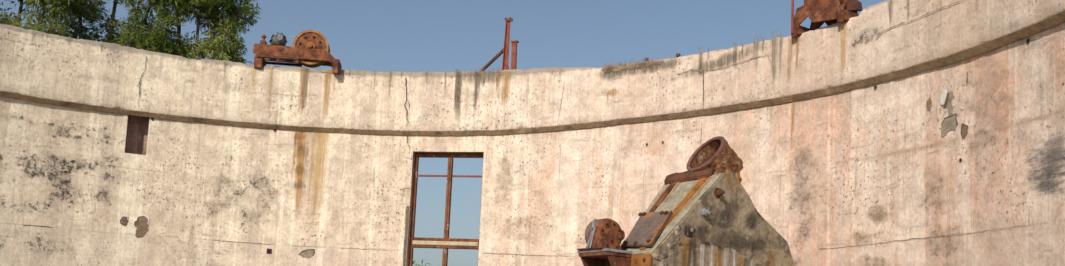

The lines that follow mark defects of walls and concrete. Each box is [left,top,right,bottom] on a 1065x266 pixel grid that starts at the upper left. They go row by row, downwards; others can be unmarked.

water stain [603,59,676,79]
water stain [698,31,781,73]
spalling [926,90,968,139]
water stain [0,123,123,214]
corrosion [294,131,326,200]
spalling [119,214,149,238]
spalling [298,249,315,258]